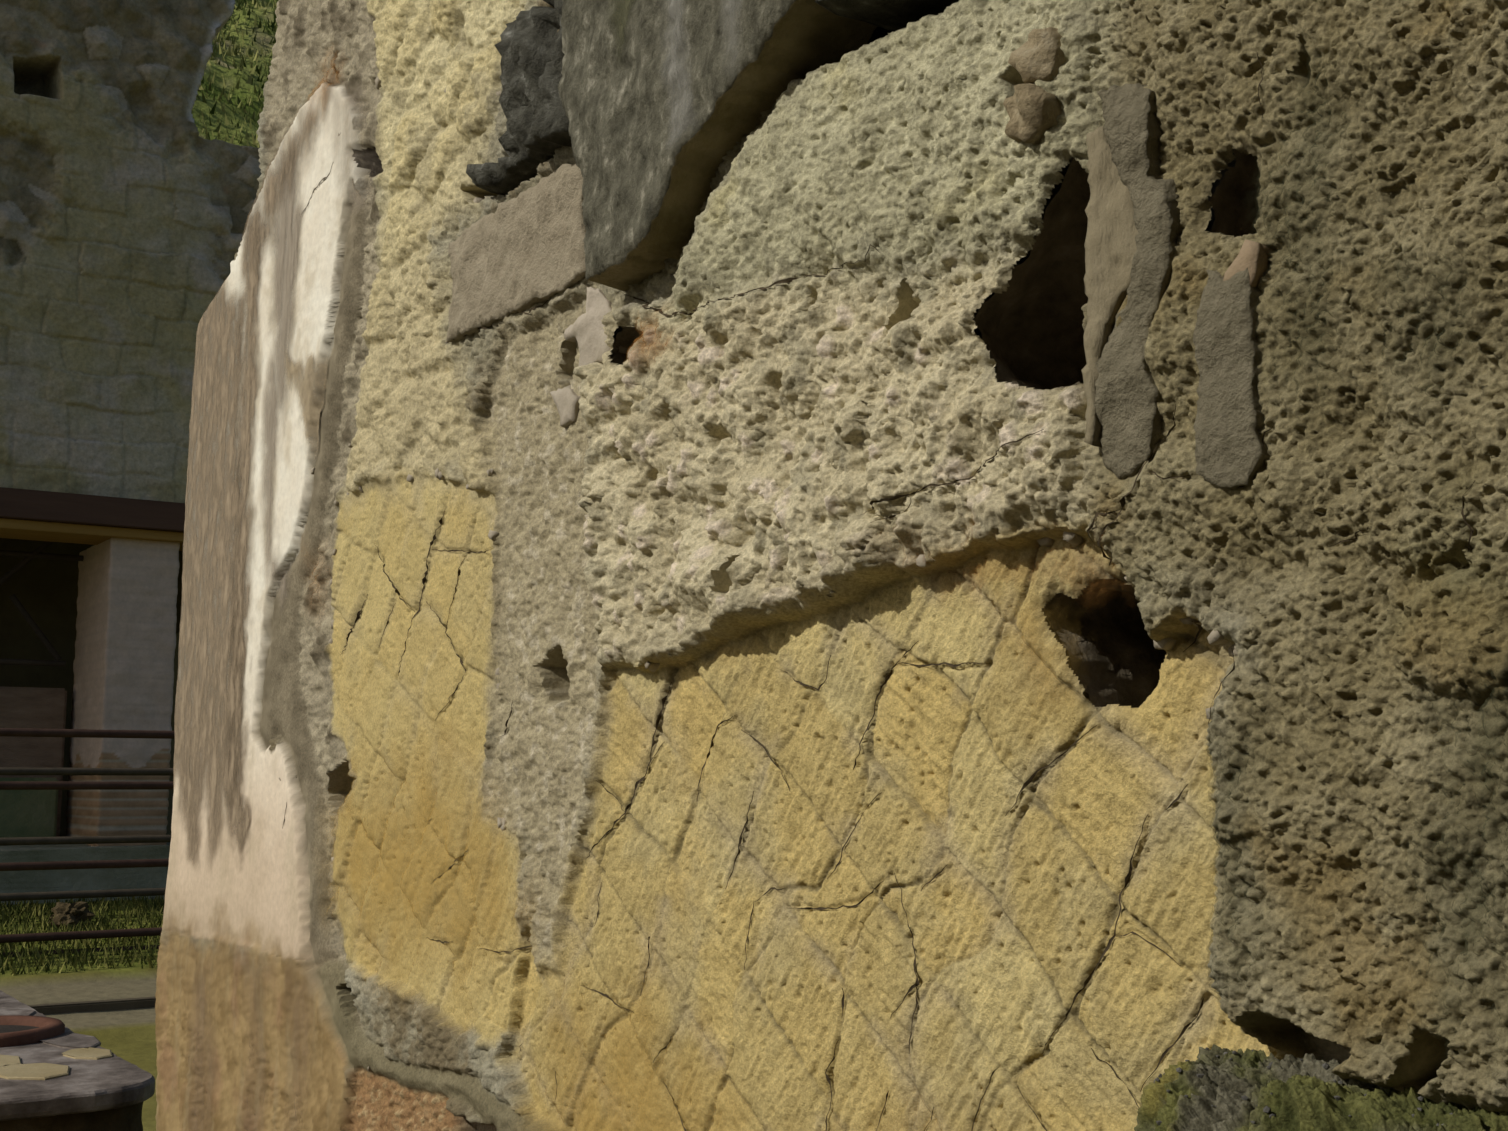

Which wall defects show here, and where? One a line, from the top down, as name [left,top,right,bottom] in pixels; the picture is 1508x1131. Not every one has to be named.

crack [446,244,879,343]
damp [173,110,327,861]
crack [340,510,488,721]
spalling [259,0,1351,1131]
crack [587,682,672,926]
crack [697,641,991,1054]
crack [1006,725,1097,815]
crack [1042,784,1188,1054]
crack [825,988,844,1131]
crack [971,1067,1047,1131]
crack [1091,998,1204,1108]
spalling [1385,1029,1450,1094]